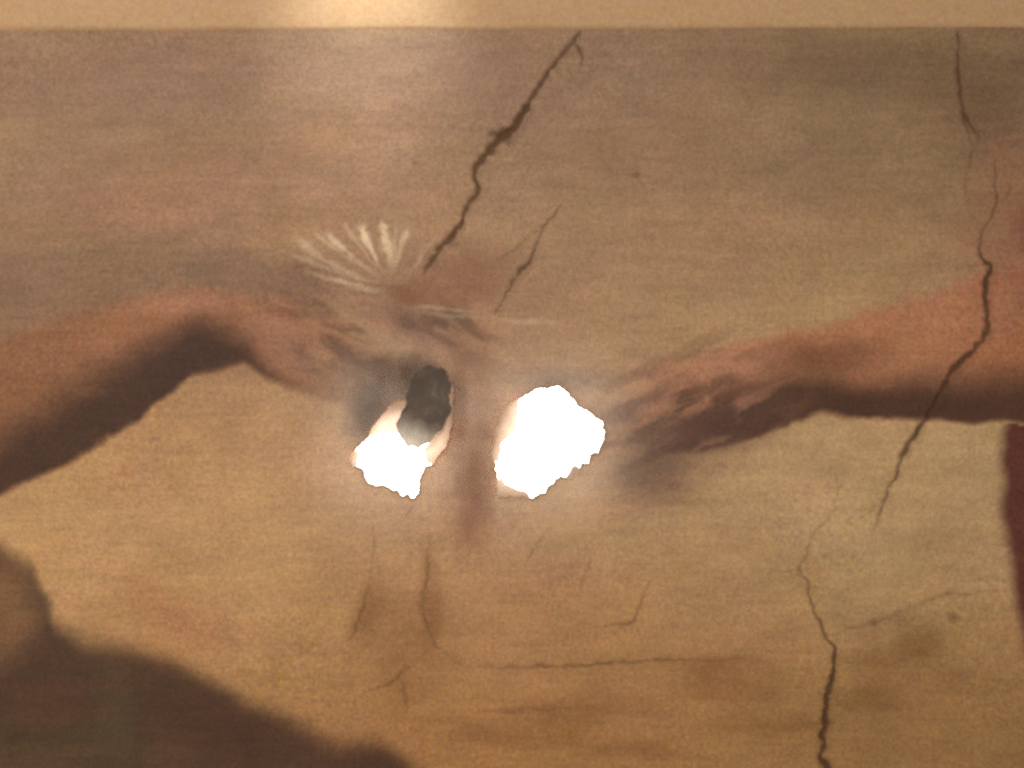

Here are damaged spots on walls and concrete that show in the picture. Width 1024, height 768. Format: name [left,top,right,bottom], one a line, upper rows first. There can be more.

crack [428,34,579,267]
crack [896,253,993,476]
peeling [369,400,406,437]
peeling [424,385,454,465]
peeling [492,398,519,462]
peeling [497,477,531,499]
peeling [567,465,580,480]
crack [818,621,836,768]